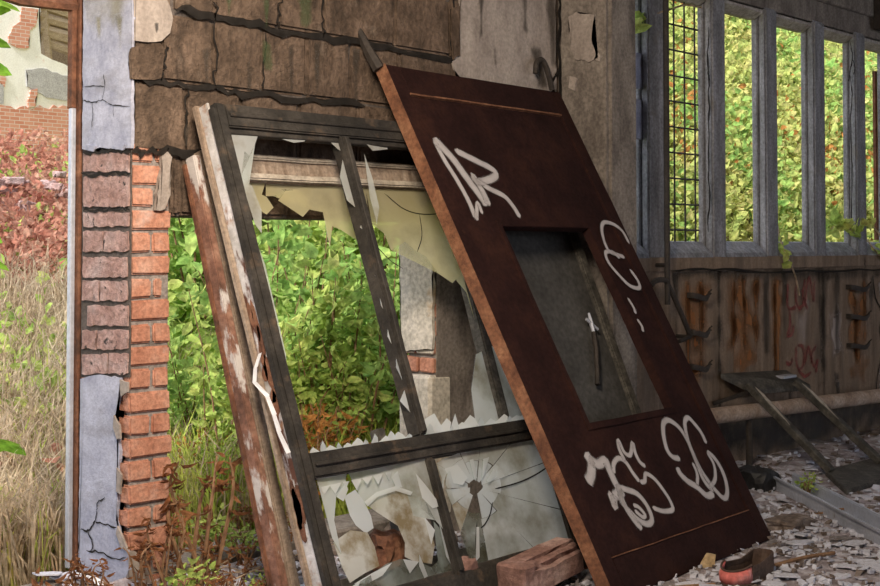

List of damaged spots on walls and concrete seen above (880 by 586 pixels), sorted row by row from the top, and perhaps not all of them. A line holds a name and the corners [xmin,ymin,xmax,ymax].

crack [81,0,452,178]
crack [83,205,130,213]
flaking render [78,0,173,584]
corrosion [731,278,759,370]
crack [80,497,125,560]